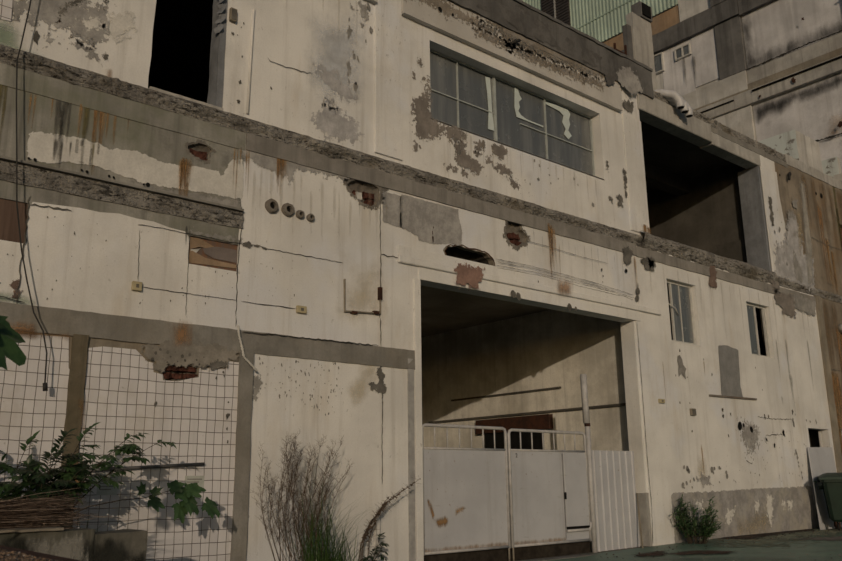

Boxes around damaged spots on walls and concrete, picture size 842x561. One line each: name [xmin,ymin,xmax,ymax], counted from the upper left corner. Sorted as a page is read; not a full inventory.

peeling [11,0,137,67]
peeling [306,50,364,146]
peeling [409,57,521,194]
peeling [406,0,605,92]
peeling [616,66,676,114]
peeling [27,131,495,291]
spalling [503,220,531,251]
peeling [768,196,816,319]
peeling [139,340,242,381]
spalling [368,366,387,398]
peeling [722,408,795,461]
peeling [636,450,842,556]